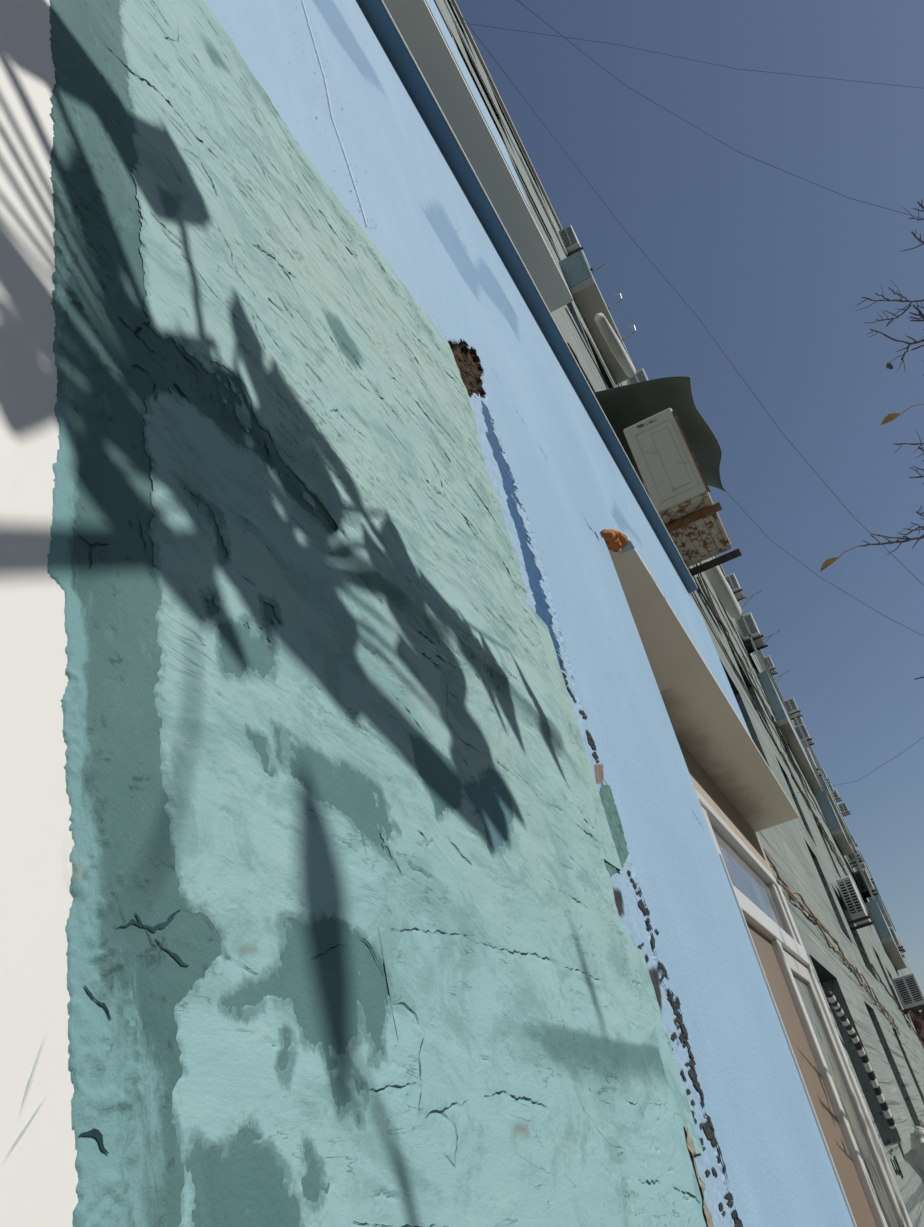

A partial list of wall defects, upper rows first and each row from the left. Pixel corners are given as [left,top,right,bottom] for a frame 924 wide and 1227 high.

spalling [448,339,486,399]
peeling [47,0,336,1227]
peeling [410,733,514,854]
flaking render [599,784,650,915]
crack [79,1128,109,1154]
crack [84,985,111,1019]
crack [116,906,258,974]
peeling [221,917,389,1125]
crack [315,927,596,979]
crack [369,1002,547,1167]
crack [637,884,742,1226]
peeling [681,1062,743,1227]